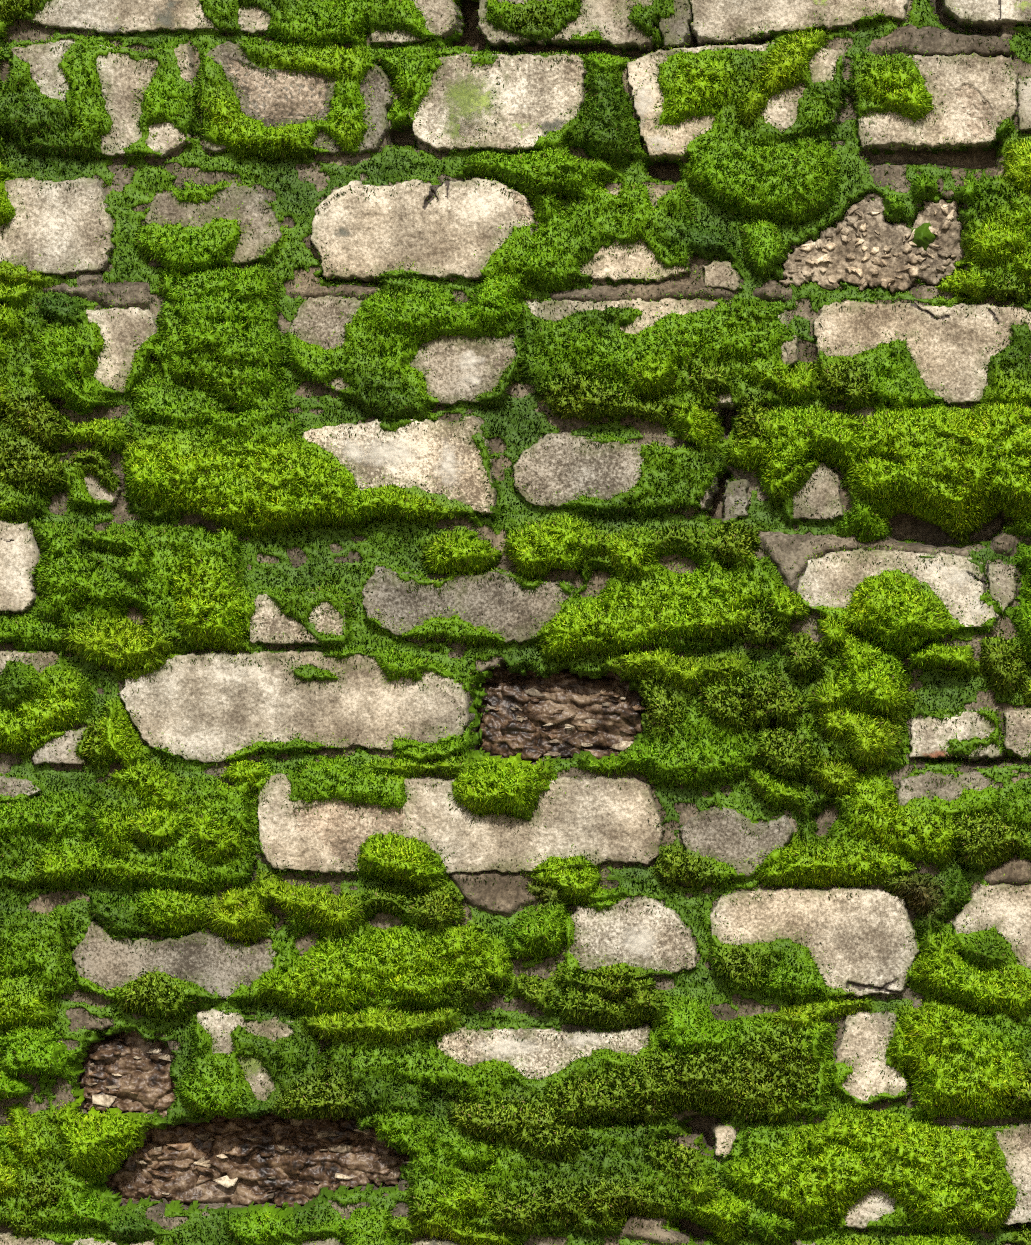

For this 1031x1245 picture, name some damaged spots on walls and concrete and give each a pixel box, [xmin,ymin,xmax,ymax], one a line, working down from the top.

crack [423,180,450,210]